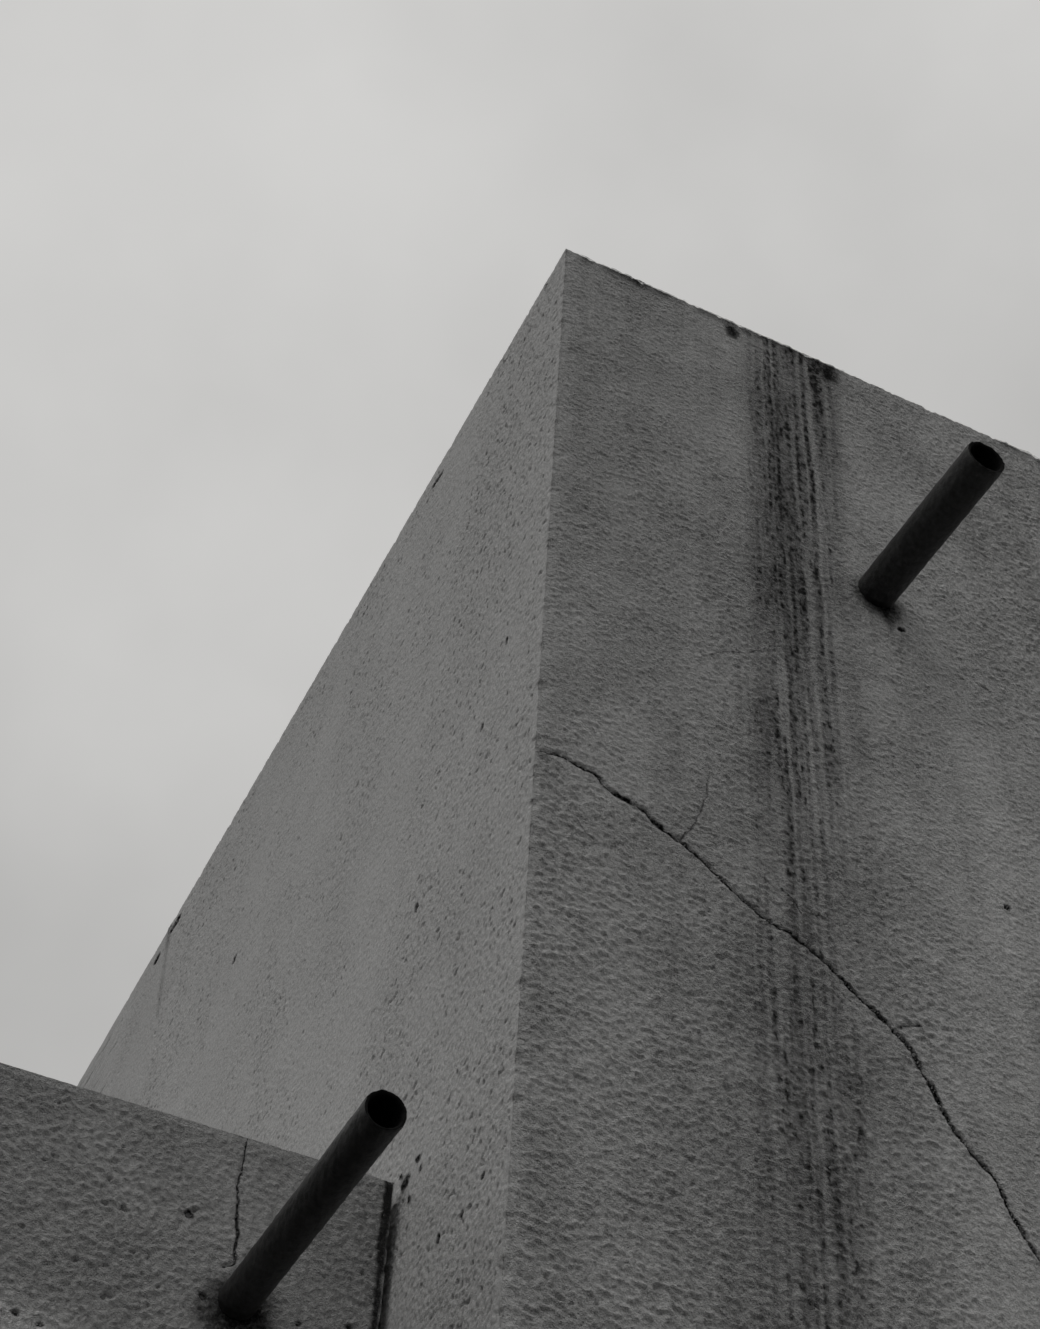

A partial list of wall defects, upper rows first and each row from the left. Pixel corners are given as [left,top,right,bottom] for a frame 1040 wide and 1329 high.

crack [223,1138,248,1268]
crack [539,751,1040,1262]
water stain [749,333,868,1274]